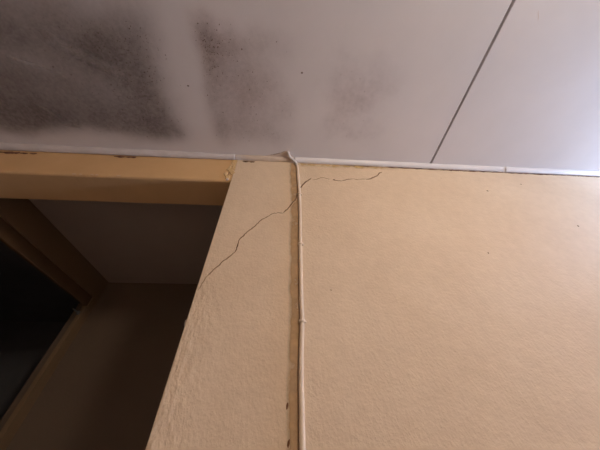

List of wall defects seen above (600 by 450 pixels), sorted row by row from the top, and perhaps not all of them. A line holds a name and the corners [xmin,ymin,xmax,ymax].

water stain [0,21,179,137]
crack [197,163,598,291]
crack [295,305,303,443]